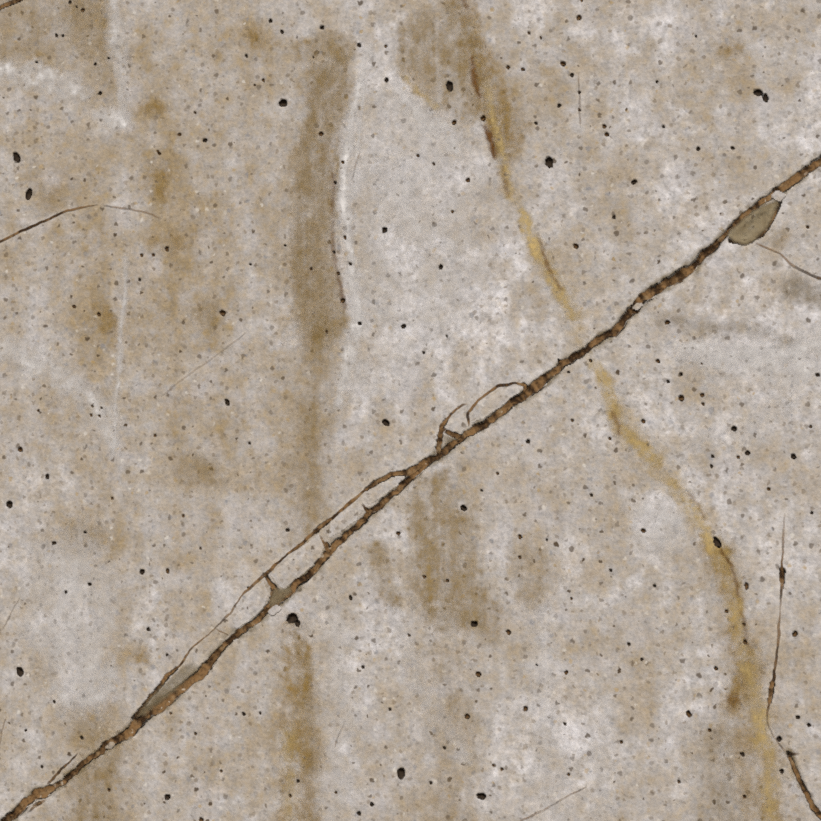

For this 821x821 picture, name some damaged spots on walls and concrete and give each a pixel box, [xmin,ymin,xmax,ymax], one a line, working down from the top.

rust [484,91,512,198]
crack [0,205,94,243]
leakage [313,46,371,406]
rust [519,209,574,318]
crack [728,201,780,245]
crack [436,404,466,452]
crack [466,382,527,424]
rust [596,370,659,462]
rust [688,505,731,575]
crack [133,465,421,719]
crack [766,551,784,713]
crack [787,750,821,819]